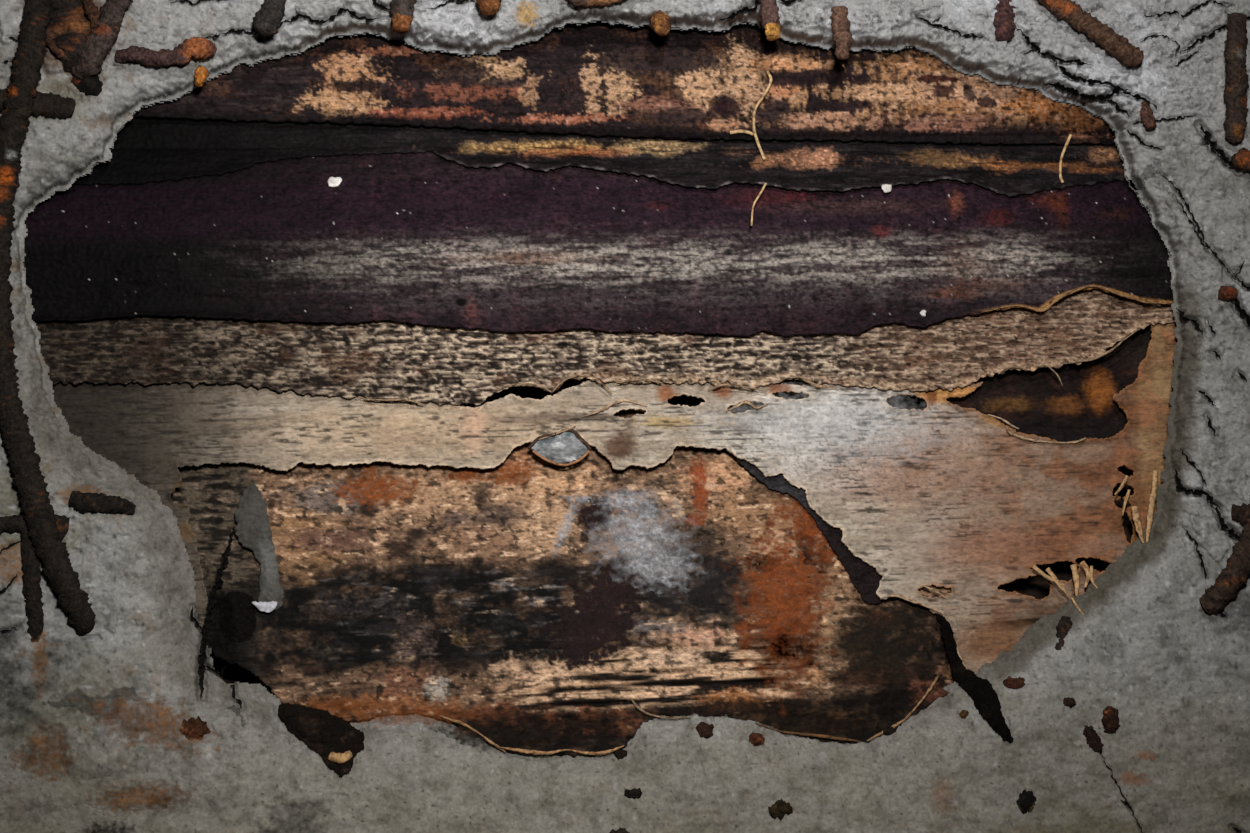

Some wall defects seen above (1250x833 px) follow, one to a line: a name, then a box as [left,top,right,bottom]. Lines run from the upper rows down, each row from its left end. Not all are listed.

rust [44,0,101,72]
rust [194,65,209,87]
crack [202,0,391,40]
crack [915,14,983,38]
crack [1139,0,1250,68]
spalling [776,0,1250,392]
crack [1016,27,1250,381]
spalling [0,0,765,817]
spalling [946,325,1152,444]
spalling [1158,406,1250,616]
crack [1175,448,1240,579]
damp [268,494,739,670]